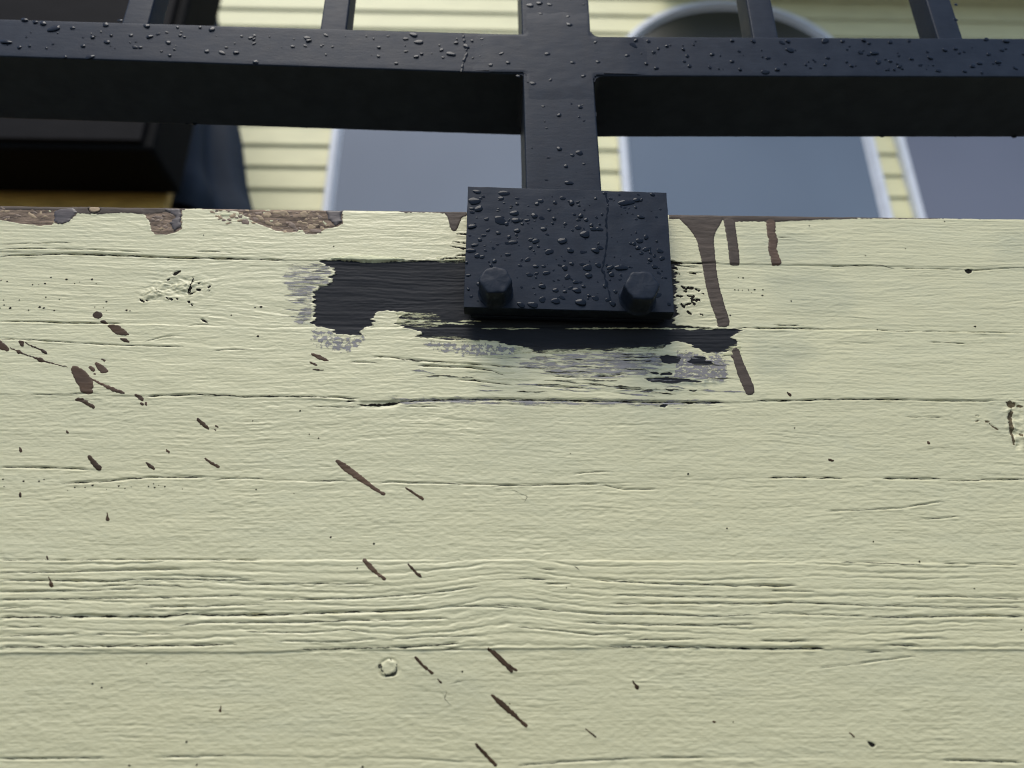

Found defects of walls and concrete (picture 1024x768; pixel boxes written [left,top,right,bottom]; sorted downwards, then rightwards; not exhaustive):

peeling [0,207,101,226]
peeling [145,208,182,235]
peeling [210,209,343,234]
peeling [282,233,746,409]